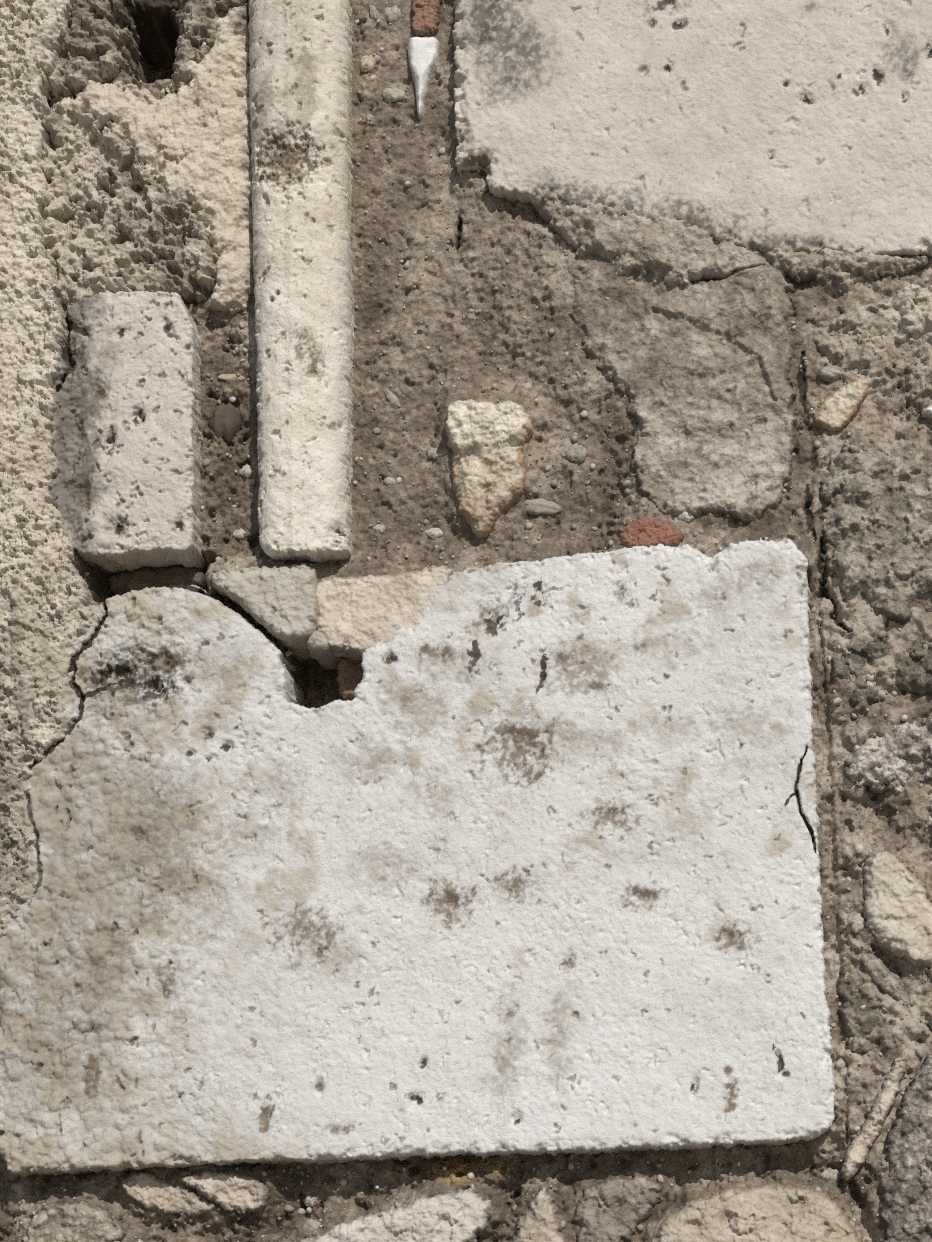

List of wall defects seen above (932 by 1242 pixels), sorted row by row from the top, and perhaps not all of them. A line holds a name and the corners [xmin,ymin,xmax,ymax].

crack [796,351,809,414]
crack [803,483,853,632]
crack [25,602,117,905]
crack [785,746,816,853]